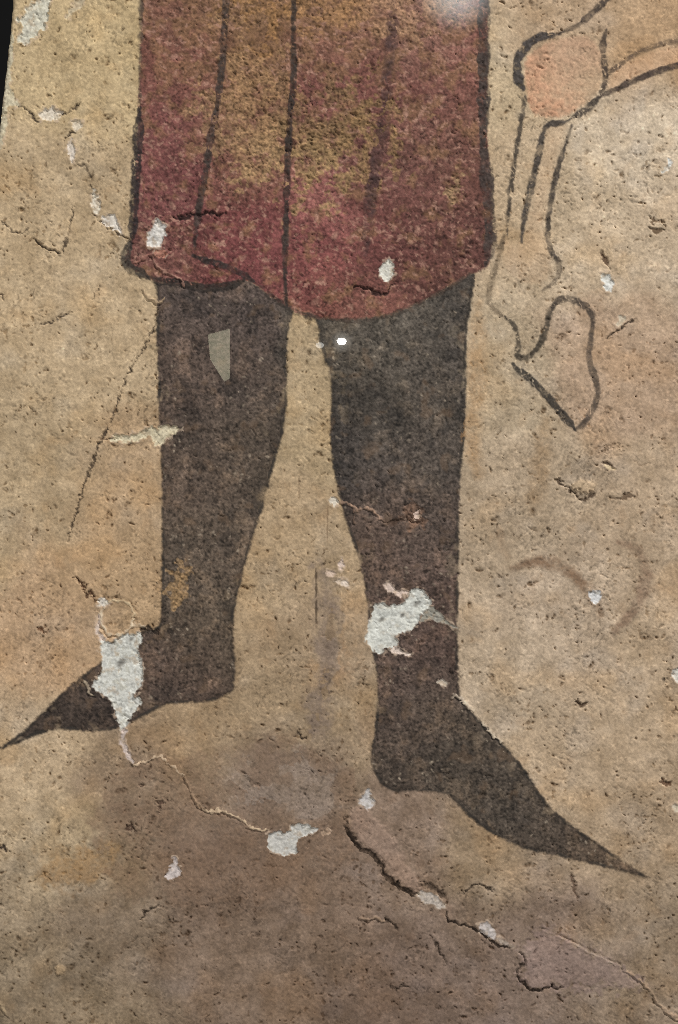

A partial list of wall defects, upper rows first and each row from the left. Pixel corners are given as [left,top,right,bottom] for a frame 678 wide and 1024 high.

spalling [0,0,87,166]
spalling [145,217,169,259]
spalling [378,256,398,283]
crack [67,161,185,543]
spalling [98,422,184,448]
spalling [71,576,160,732]
spalling [363,580,458,658]
crack [117,727,270,832]
spalling [264,822,332,857]
crack [414,881,516,967]
crack [569,872,580,902]
crack [386,982,411,992]